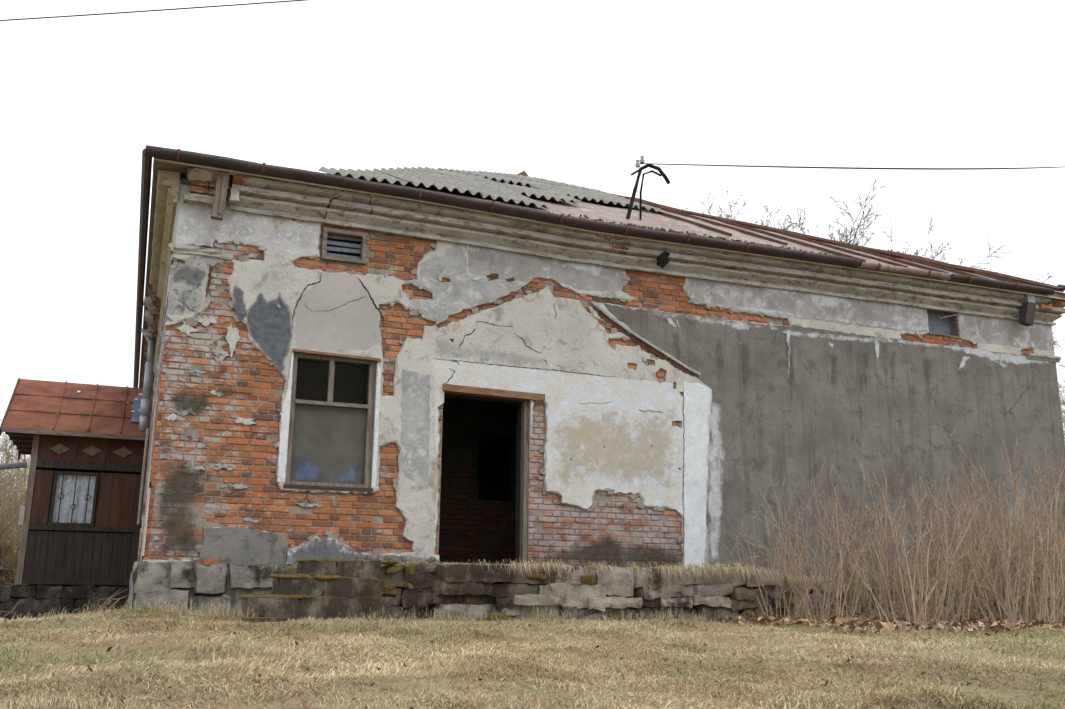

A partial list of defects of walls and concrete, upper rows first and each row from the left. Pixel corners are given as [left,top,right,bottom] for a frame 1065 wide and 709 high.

crack [292,275,384,324]
flaking render [293,224,789,396]
damp [173,388,234,412]
flaking render [127,238,413,562]
damp [159,463,210,552]
flaking render [528,402,682,568]